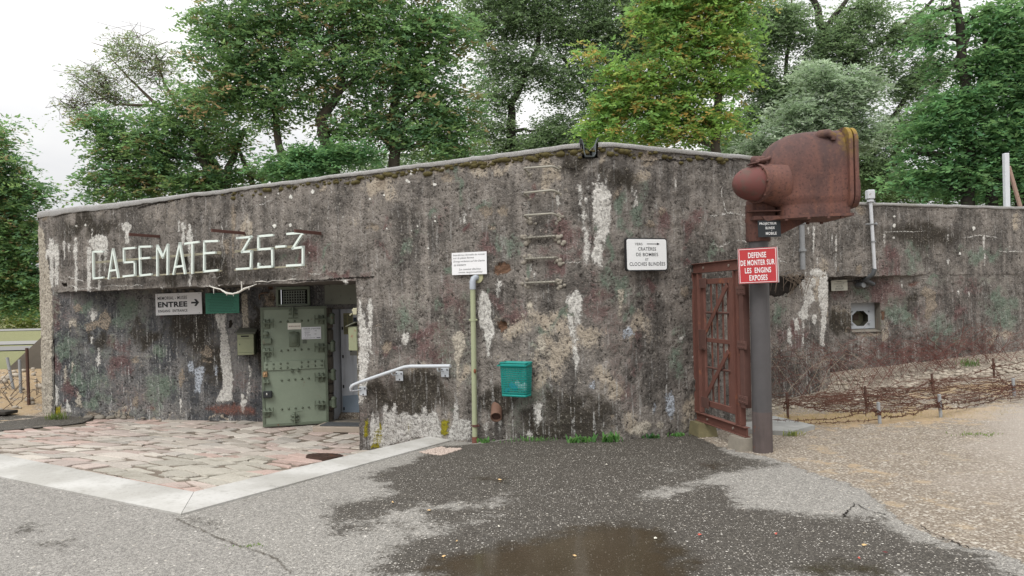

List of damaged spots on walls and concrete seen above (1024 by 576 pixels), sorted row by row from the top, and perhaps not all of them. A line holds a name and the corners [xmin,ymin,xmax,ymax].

damp [188,279,296,411]